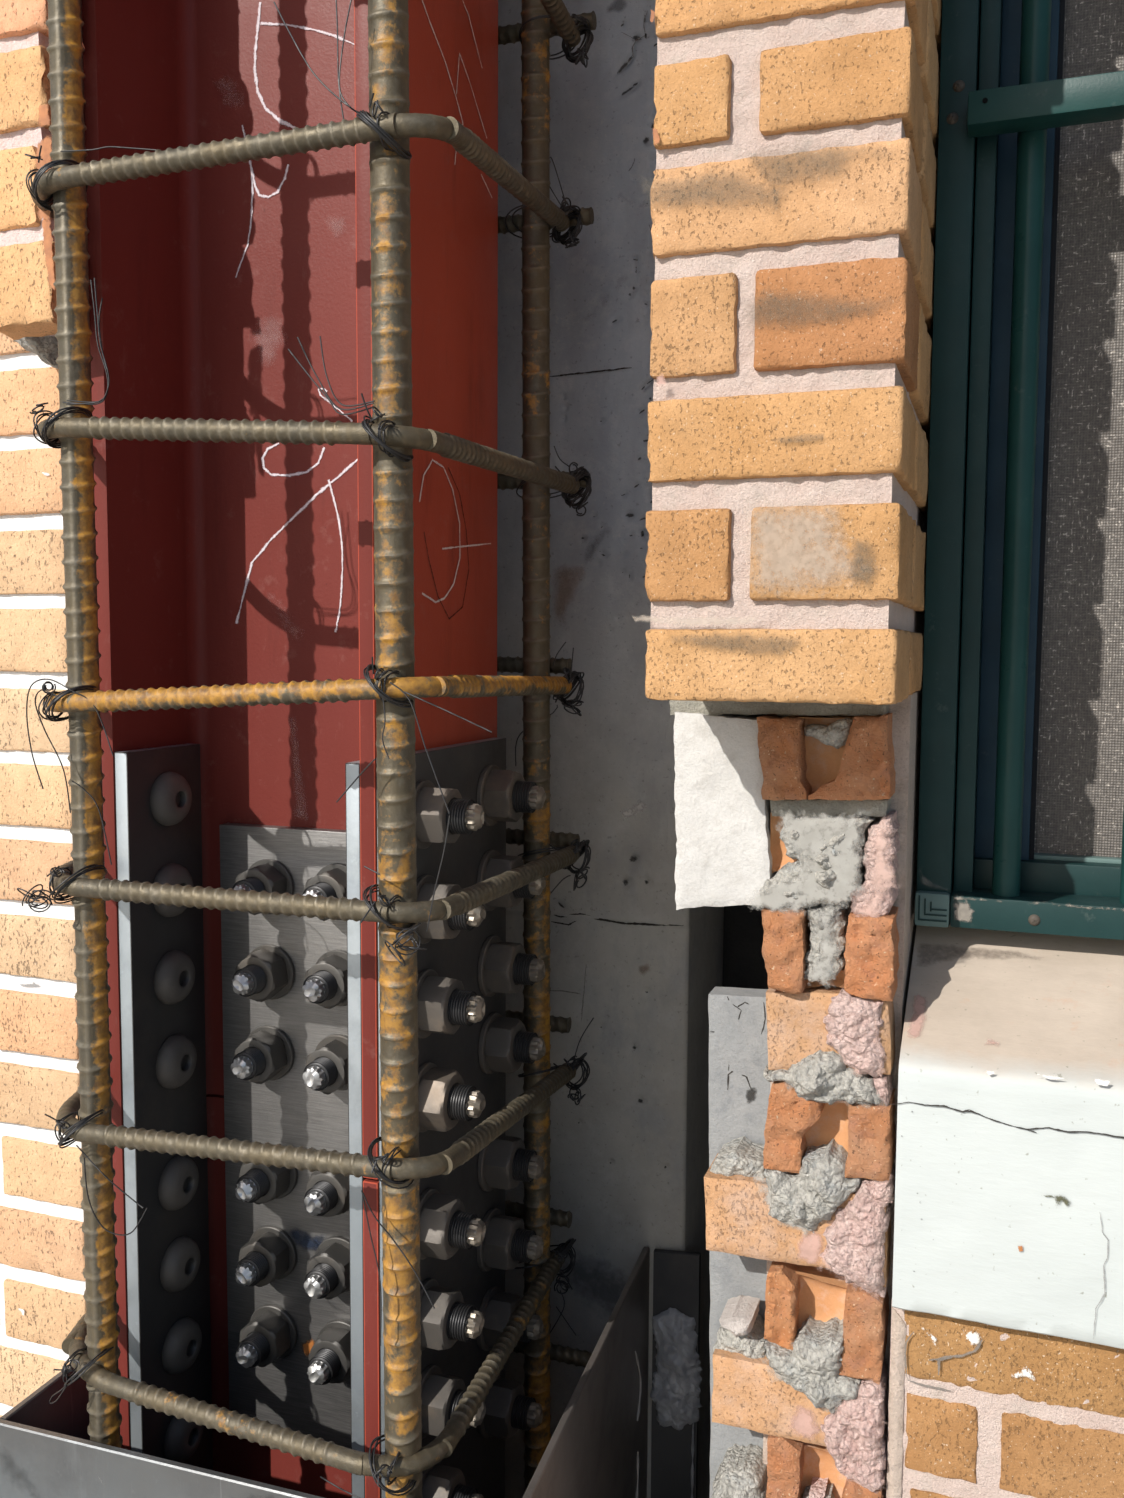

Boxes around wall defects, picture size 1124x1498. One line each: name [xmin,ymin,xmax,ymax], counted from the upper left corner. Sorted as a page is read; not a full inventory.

spalling [757,713,896,801]
spalling [762,906,811,994]
spalling [844,906,899,1001]
spalling [746,1081,825,1173]
spalling [845,1088,896,1181]
crack [888,1102,1124,1139]
crack [1093,1214,1109,1339]